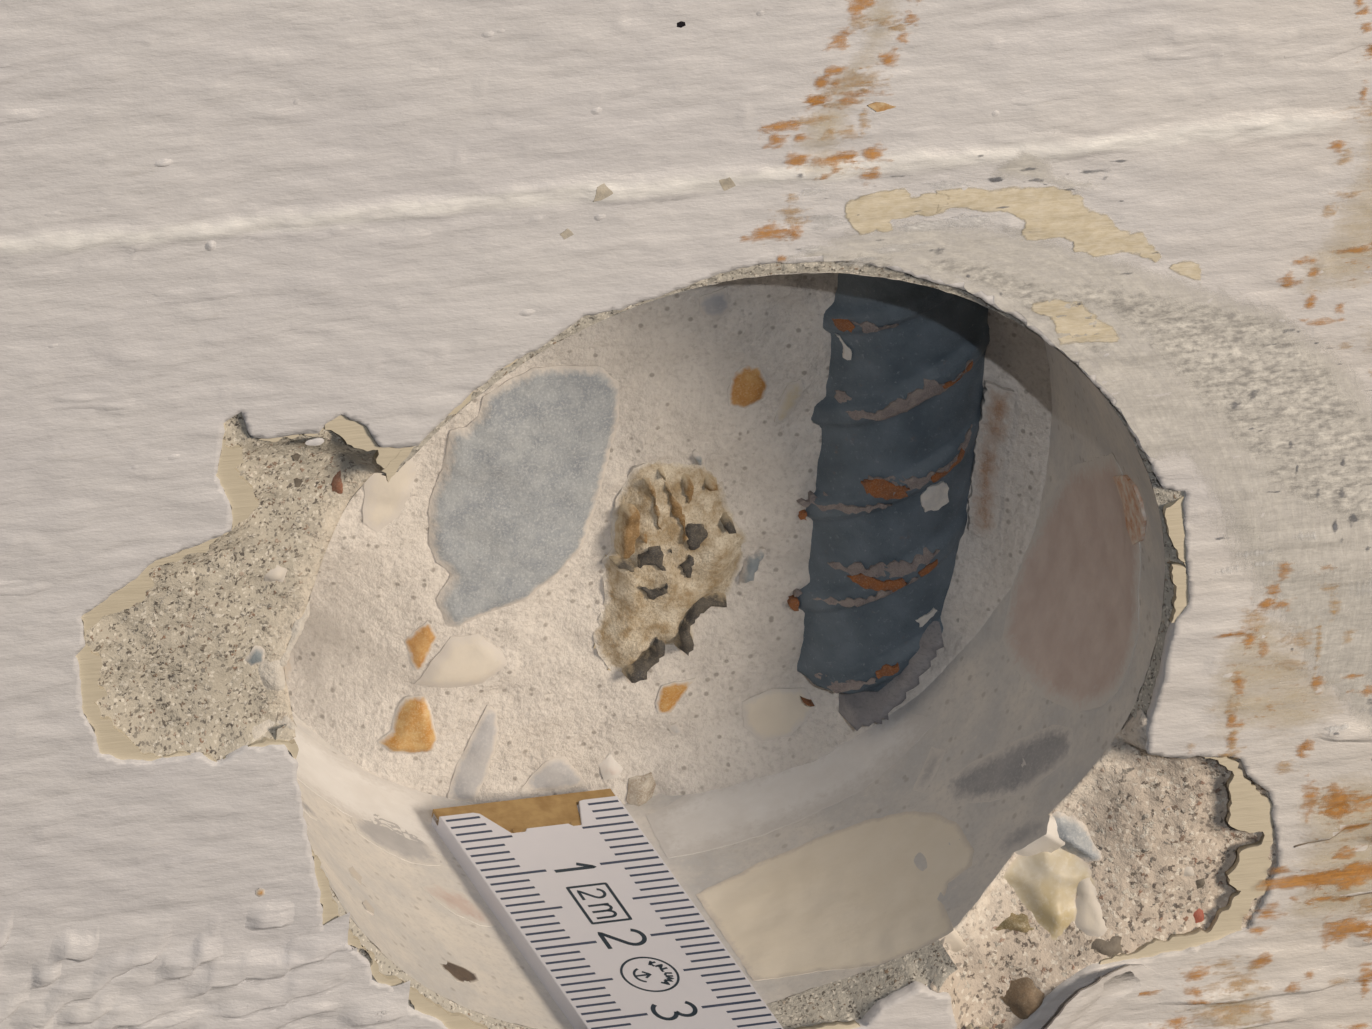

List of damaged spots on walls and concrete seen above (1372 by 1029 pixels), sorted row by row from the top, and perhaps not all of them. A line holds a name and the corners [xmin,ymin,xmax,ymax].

corrosion [850,0,874,15]
corrosion [763,68,871,165]
corrosion [822,148,881,179]
corrosion [744,210,798,240]
corrosion [861,479,910,500]
corrosion [847,559,938,592]
spalling [76,261,1276,1029]
corrosion [1220,564,1289,756]
crack [1294,823,1369,848]
corrosion [1260,788,1372,940]
corrosion [1231,956,1271,987]
corrosion [1189,964,1250,1018]